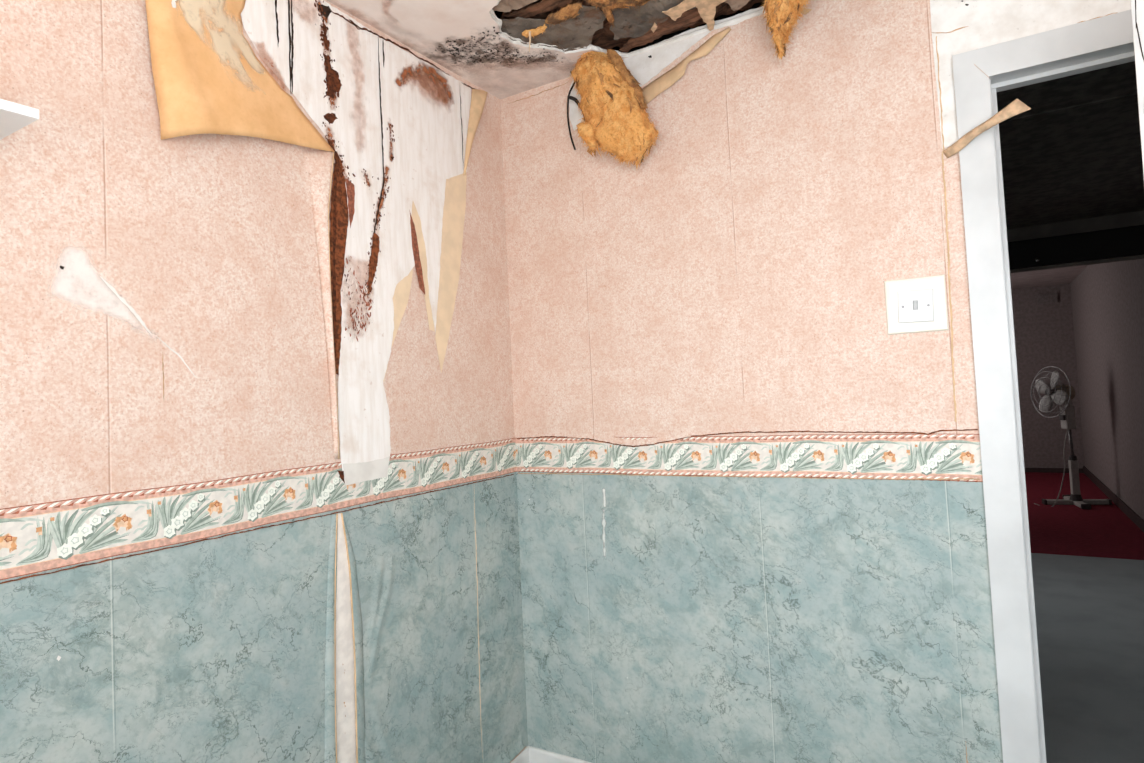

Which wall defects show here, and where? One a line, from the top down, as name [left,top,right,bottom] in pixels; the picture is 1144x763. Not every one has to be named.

water stain [395,27,564,102]
flaking render [569,80,583,131]
flaking render [623,6,764,104]
peeling [145,0,488,485]
flaking render [930,0,1131,422]